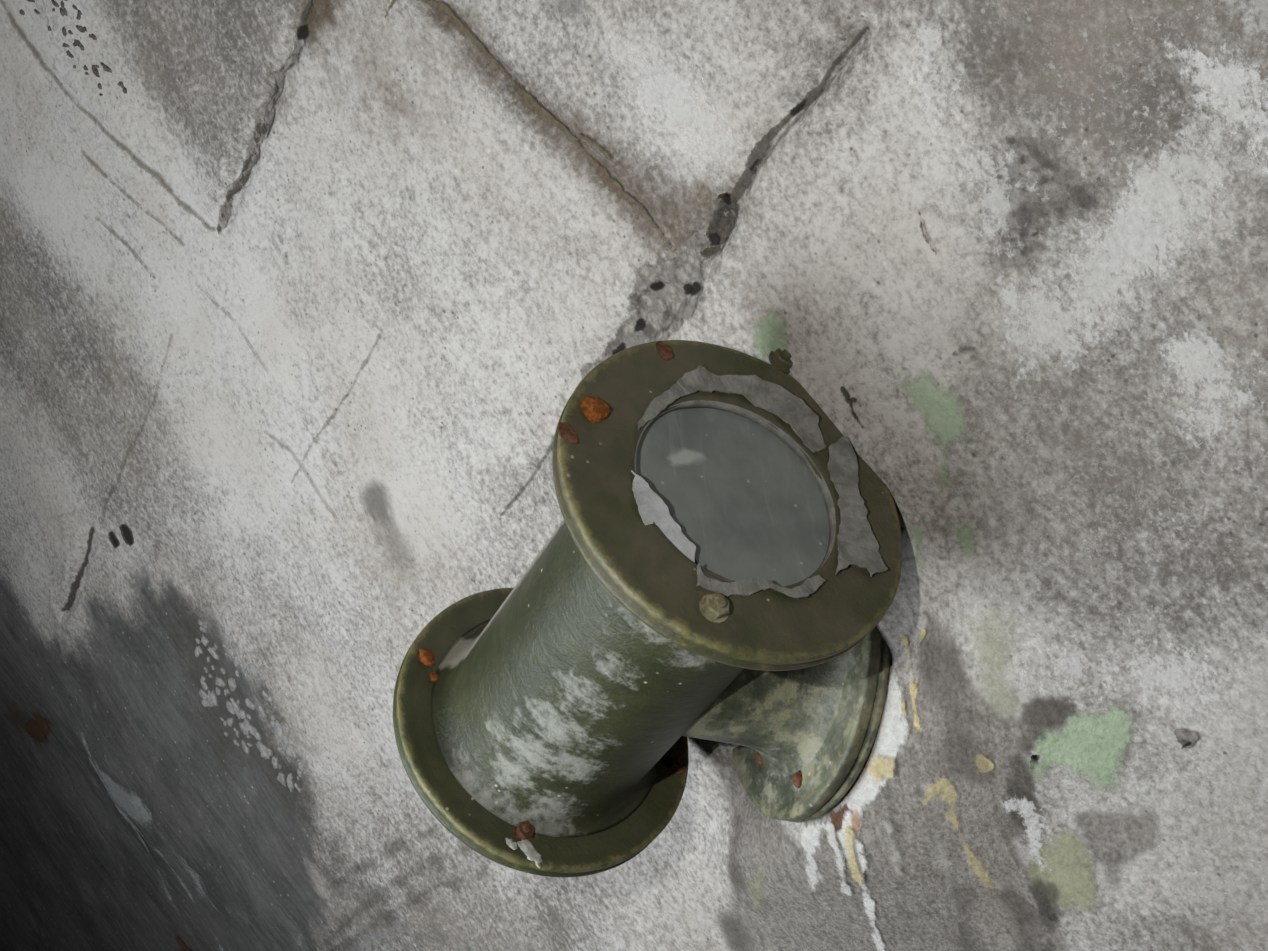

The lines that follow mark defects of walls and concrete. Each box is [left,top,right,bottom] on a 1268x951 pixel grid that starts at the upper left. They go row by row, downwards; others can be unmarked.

peeling [19,0,127,96]
crack [217,0,312,234]
crack [385,0,866,296]
spalling [1006,138,1053,185]
spalling [1055,185,1093,213]
crack [613,319,645,355]
crack [840,386,863,428]
crack [61,524,133,611]
damp [722,620,1220,951]
peeling [1035,707,1132,789]
peeling [1032,835,1093,908]